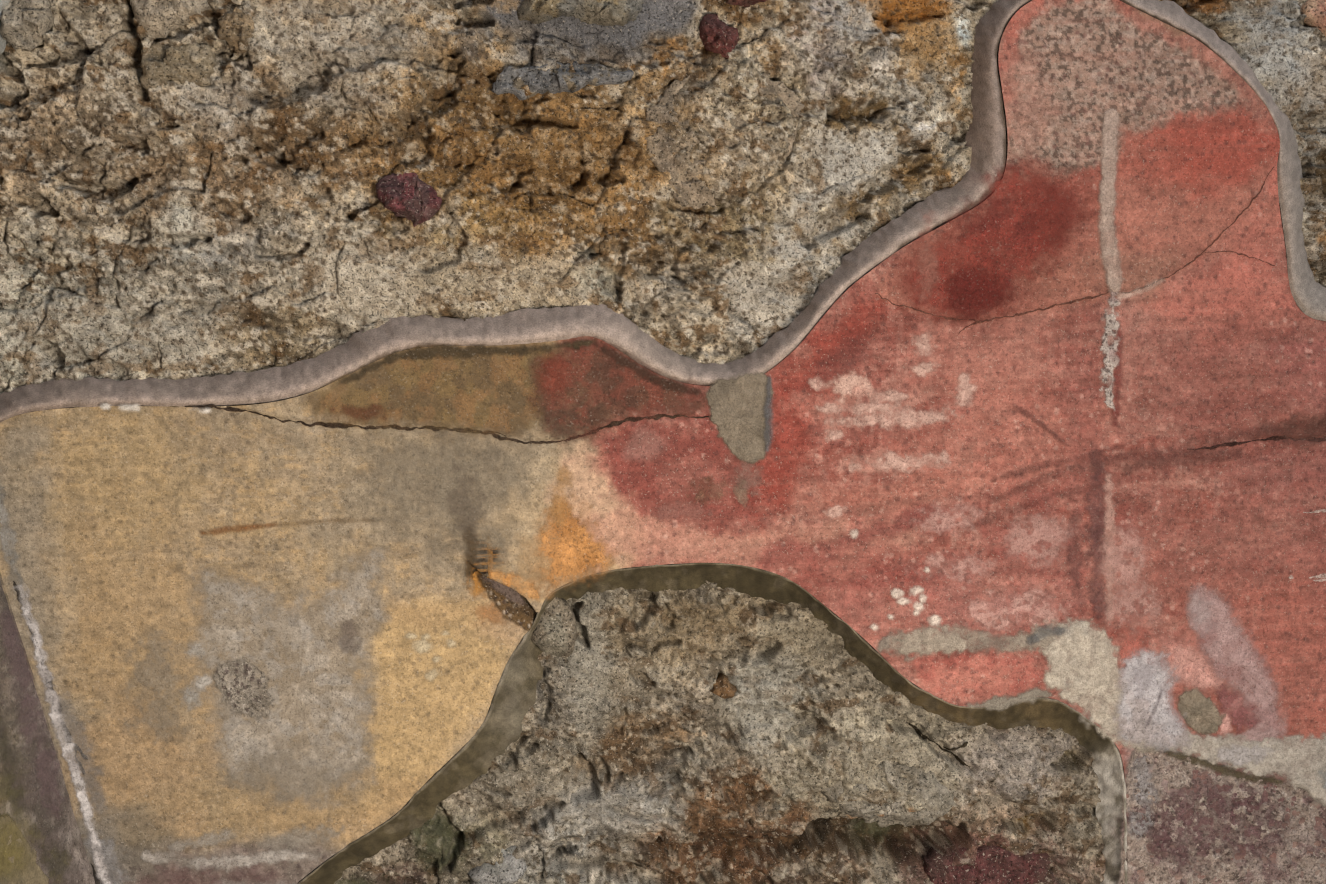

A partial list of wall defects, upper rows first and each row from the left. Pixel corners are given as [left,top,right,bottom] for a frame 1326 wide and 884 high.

flaking render [0,0,1032,422]
leakage [905,165,1072,320]
crack [875,167,1275,335]
flaking render [1120,0,1326,321]
peeling [810,374,976,440]
peeling [878,452,948,471]
leakage [1113,330,1121,425]
crack [1187,436,1326,450]
peeling [1010,519,1063,557]
peeling [1107,531,1154,677]
flaking render [185,660,273,718]
flaking render [297,563,1326,884]